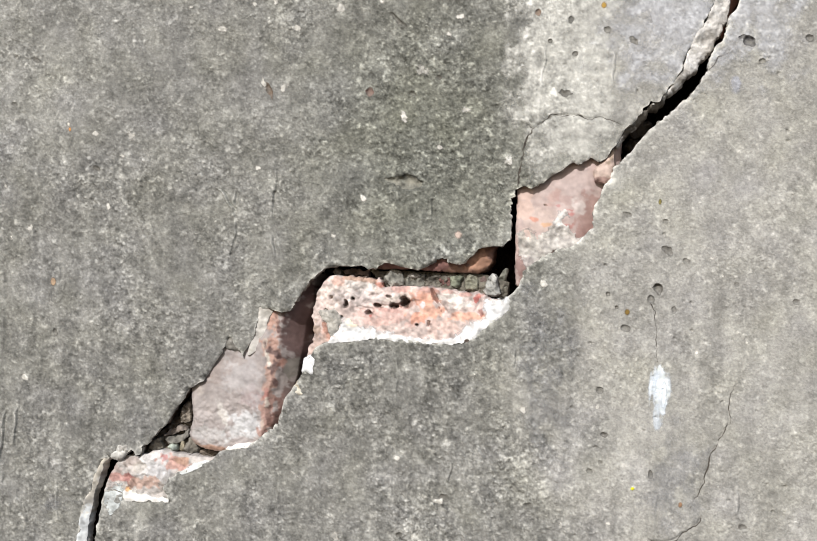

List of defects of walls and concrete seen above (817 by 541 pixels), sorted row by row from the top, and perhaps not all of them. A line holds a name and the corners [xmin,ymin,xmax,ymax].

crack [481,0,740,295]
crack [322,266,389,277]
flaking render [101,46,716,515]
crack [76,451,133,541]
crack [674,385,735,541]